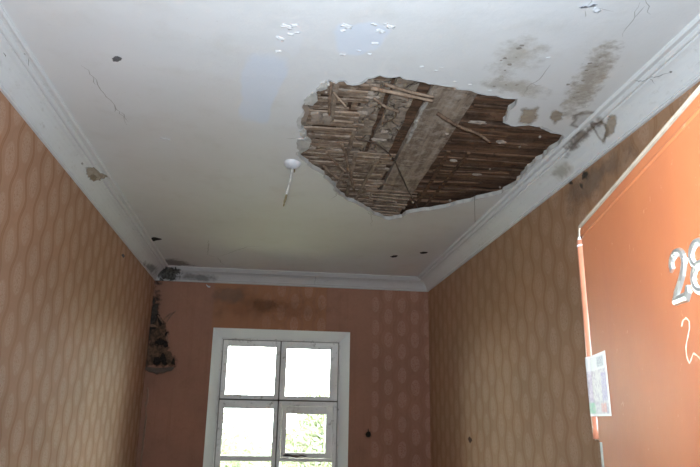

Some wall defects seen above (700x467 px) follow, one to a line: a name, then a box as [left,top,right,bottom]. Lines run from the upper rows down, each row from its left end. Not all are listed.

peeling [330,19,397,58]
flaking render [327,75,565,204]
leakage [567,116,616,150]
peeling [87,167,108,181]